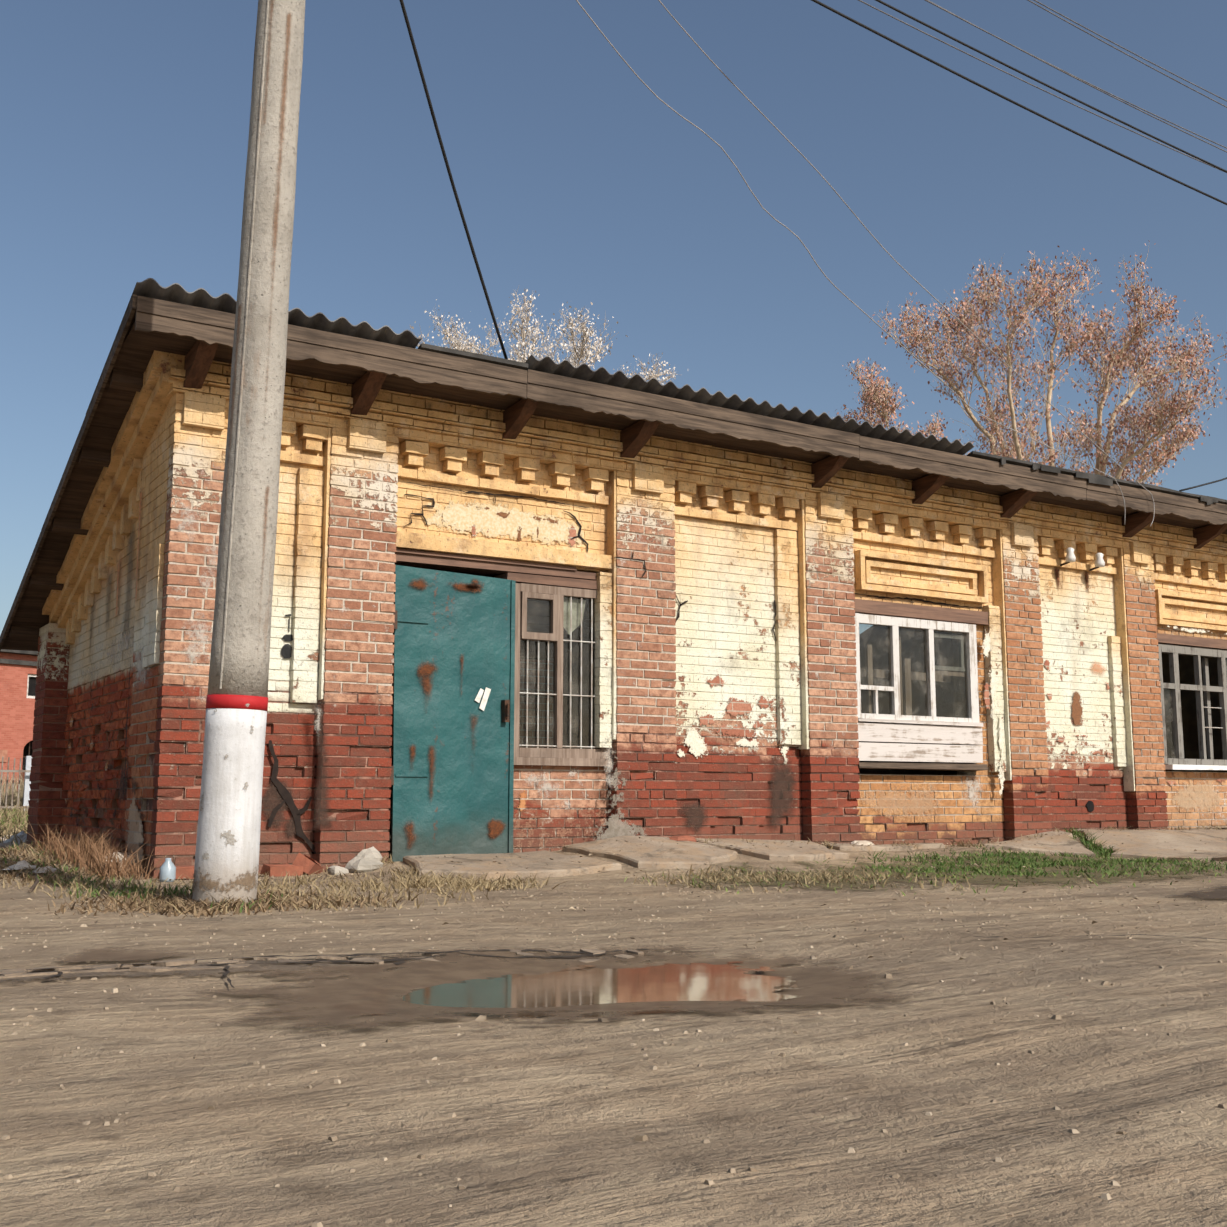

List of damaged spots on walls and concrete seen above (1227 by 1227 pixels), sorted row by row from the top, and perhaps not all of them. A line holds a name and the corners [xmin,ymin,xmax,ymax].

peeling [426,499,585,547]
crack [404,482,646,577]
rust [453,580,482,592]
crack [676,596,688,621]
rust [418,663,436,695]
peeling [677,674,789,764]
peeling [1045,691,1110,777]
spalling [62,761,145,864]
rust [488,819,505,838]